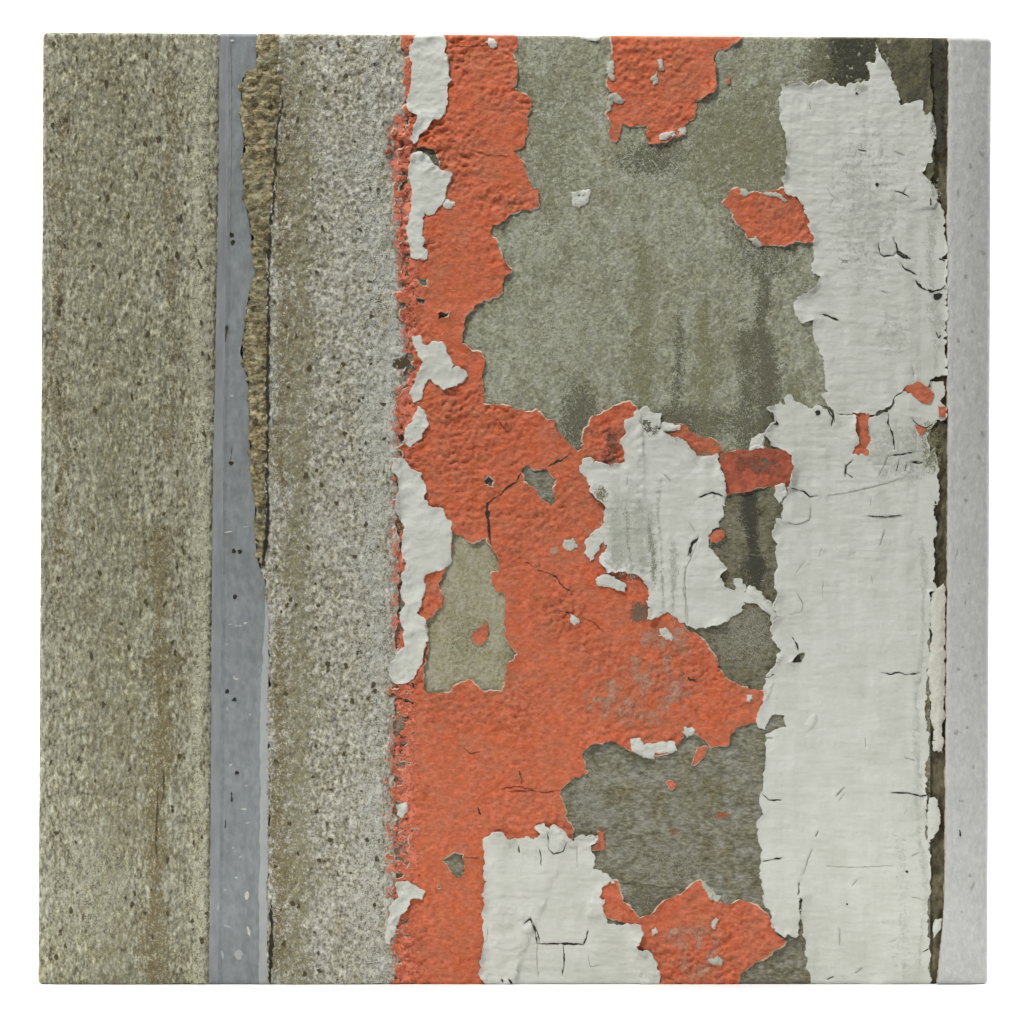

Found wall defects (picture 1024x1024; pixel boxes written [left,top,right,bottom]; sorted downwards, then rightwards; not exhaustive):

peeling [922,145,935,180]
crack [261,85,283,569]
peeling [462,35,933,457]
leakage [612,37,882,468]
crack [878,242,945,293]
peeling [423,532,516,694]
crack [485,452,572,549]
leakage [706,479,777,672]
crack [819,404,835,426]
crack [785,414,932,544]
peeling [560,714,806,984]
crack [524,918,597,976]